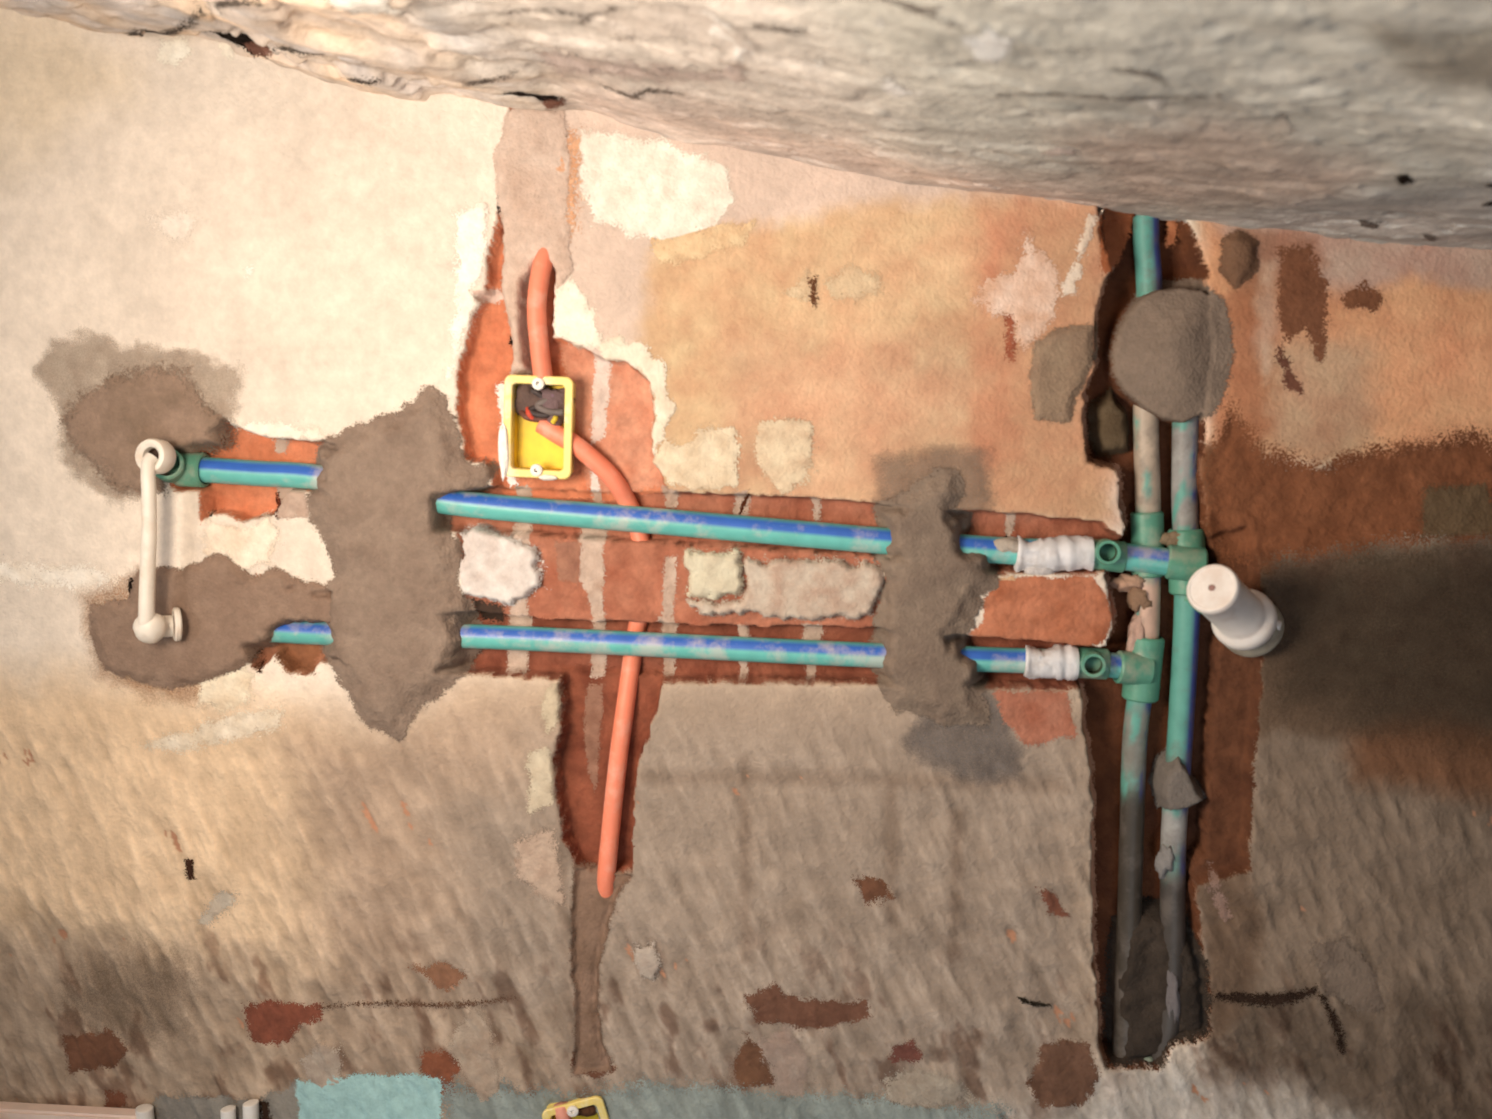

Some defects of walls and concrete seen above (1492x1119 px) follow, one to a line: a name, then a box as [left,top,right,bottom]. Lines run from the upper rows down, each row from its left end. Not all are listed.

crack [600,84,684,101]
flaking render [444,202,618,505]
flaking render [547,269,880,527]
flaking render [956,207,1180,548]
flaking render [1159,219,1210,288]
flaking render [1274,242,1386,396]
flaking render [447,515,887,643]
flaking render [968,564,1135,653]
flaking render [463,649,881,907]
flaking render [978,576,1265,1110]
peeling [152,981,1015,1119]
crack [1215,983,1348,1055]